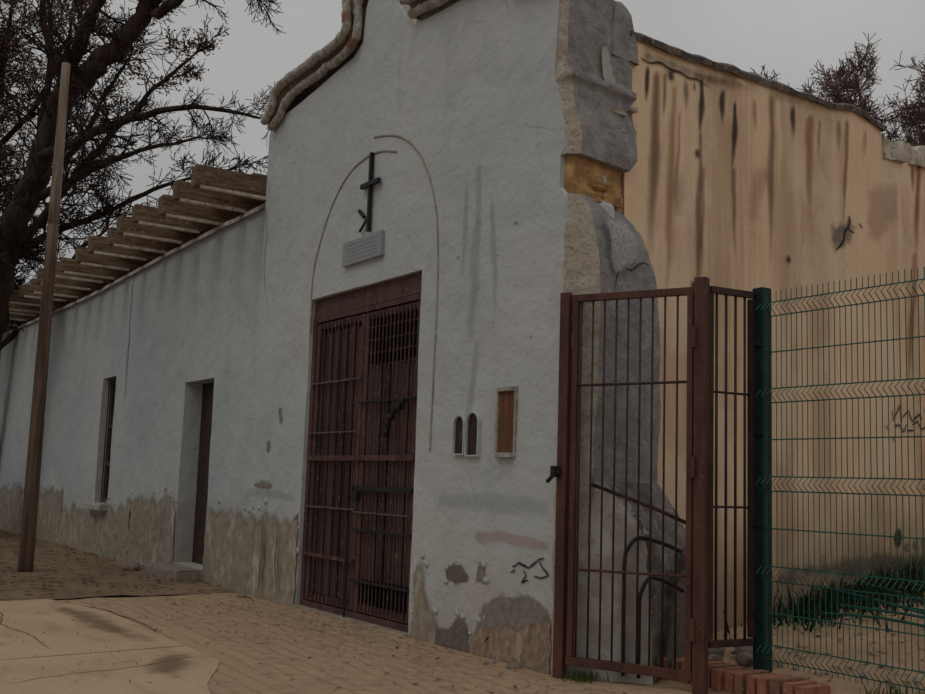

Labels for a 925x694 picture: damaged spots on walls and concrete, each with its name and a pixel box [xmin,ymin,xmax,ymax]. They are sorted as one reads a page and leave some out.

damp [646,68,666,200]
crack [642,58,708,88]
damp [696,74,712,129]
damp [720,81,738,158]
crack [836,216,862,251]
spalling [203,480,299,606]
spalling [410,552,551,674]